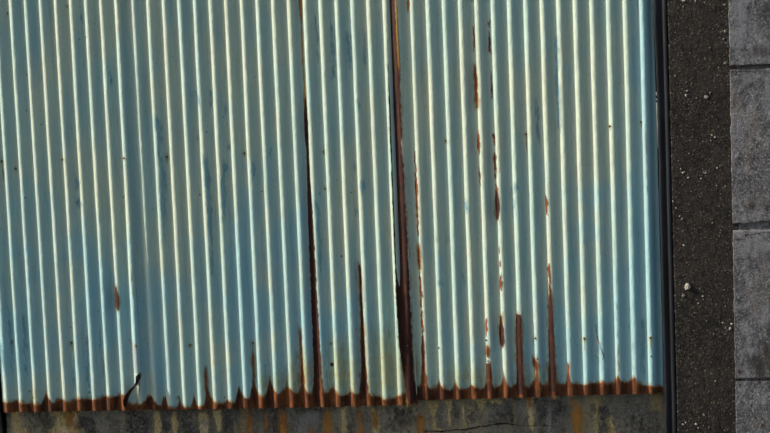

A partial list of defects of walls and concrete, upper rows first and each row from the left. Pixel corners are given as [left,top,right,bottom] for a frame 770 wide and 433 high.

rust [3,0,408,433]
rust [388,0,663,405]
water stain [143,409,237,433]
crack [426,423,552,433]